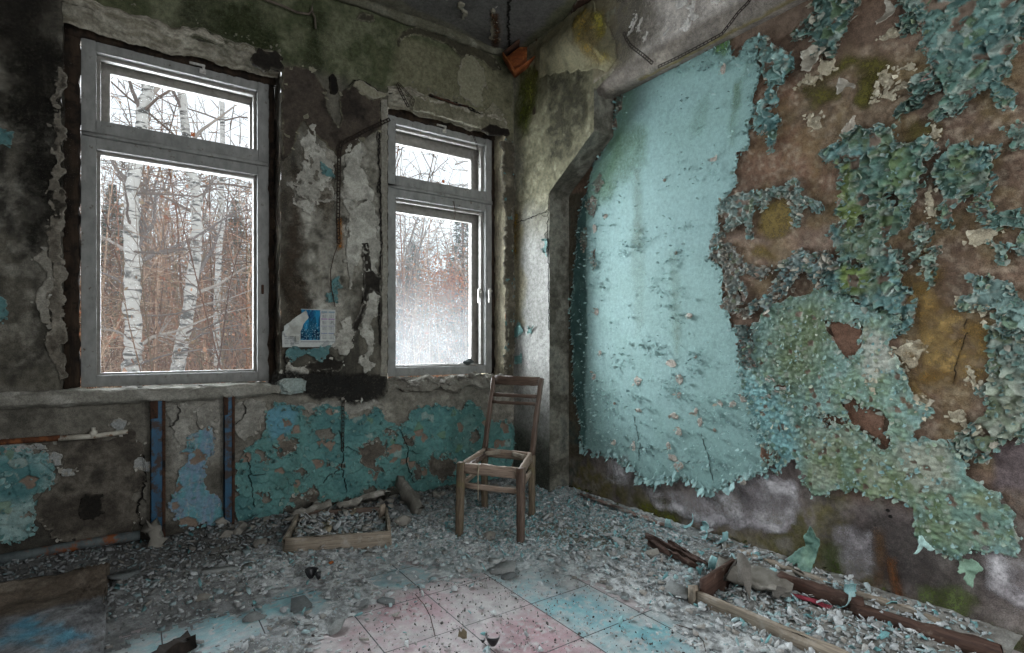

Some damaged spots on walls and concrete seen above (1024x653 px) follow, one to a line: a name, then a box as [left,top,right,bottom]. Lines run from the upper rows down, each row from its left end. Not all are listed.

damp [546,70,586,161]
flaking render [30,66,69,380]
flaking render [61,0,534,380]
peeling [568,0,1024,588]
flaking render [0,417,150,546]
crack [323,431,356,490]
peeling [166,398,517,531]
efflorescence [649,476,796,533]
peeling [690,526,994,653]
efflorescence [983,547,1024,607]